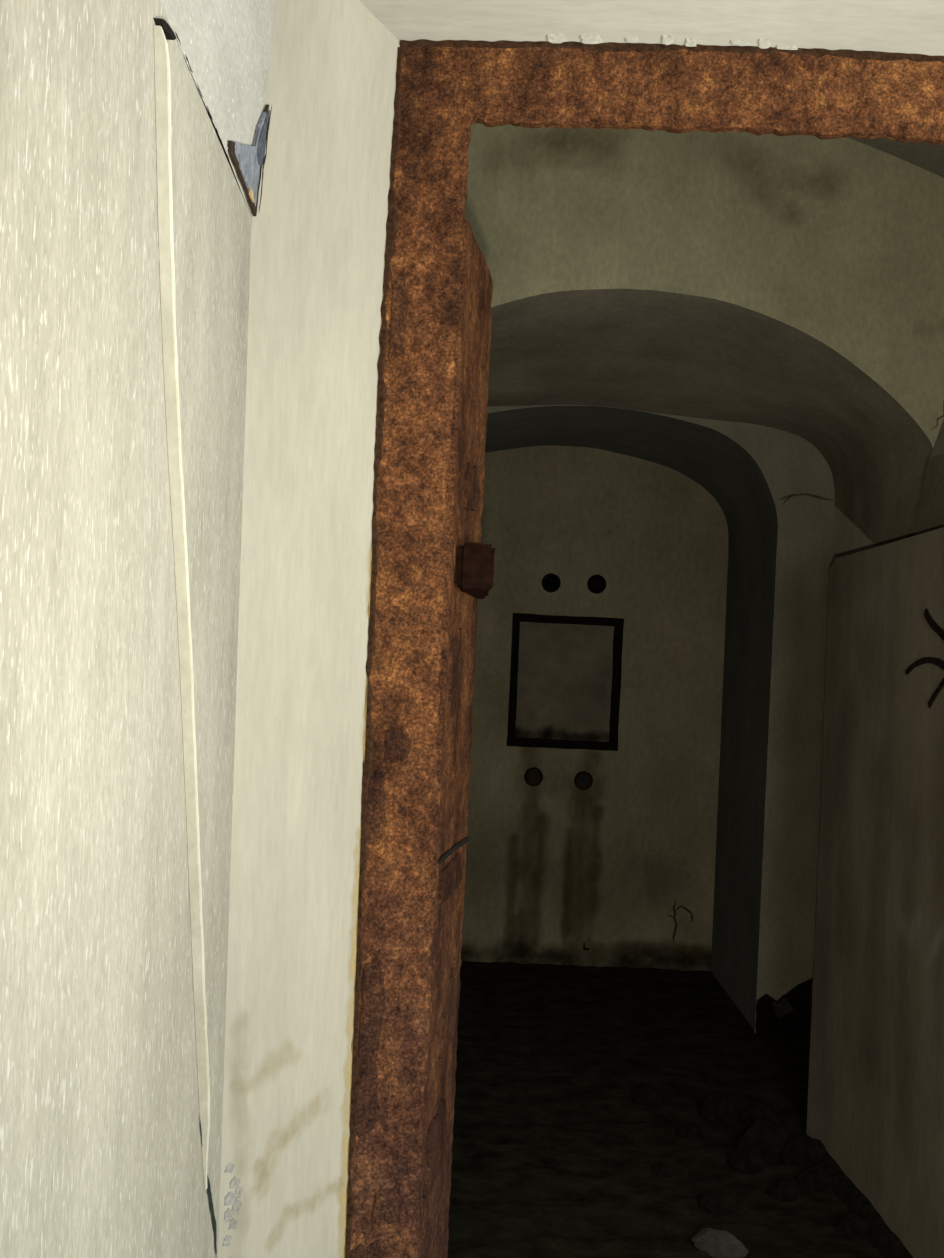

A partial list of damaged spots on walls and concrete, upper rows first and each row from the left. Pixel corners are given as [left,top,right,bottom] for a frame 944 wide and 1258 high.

spalling [227,104,272,216]
rust [341,39,944,1258]